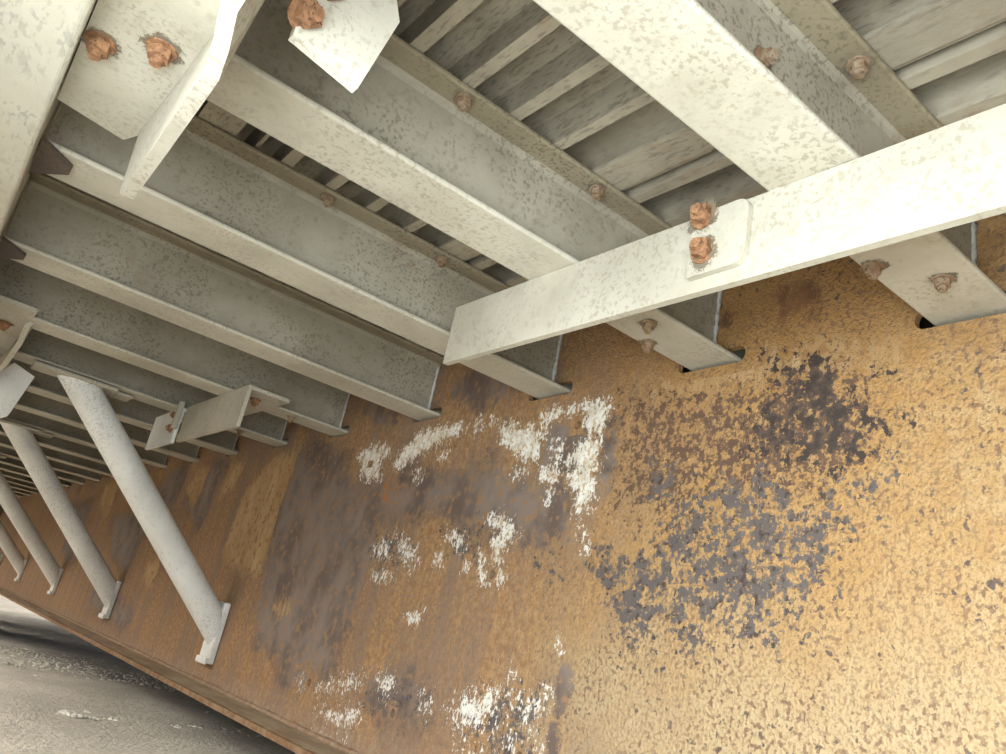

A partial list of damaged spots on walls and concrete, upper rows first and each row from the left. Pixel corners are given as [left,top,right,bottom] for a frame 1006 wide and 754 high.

rust [97,479,117,521]
rust [219,443,302,592]
rust [579,272,919,674]
rust [544,656,577,754]